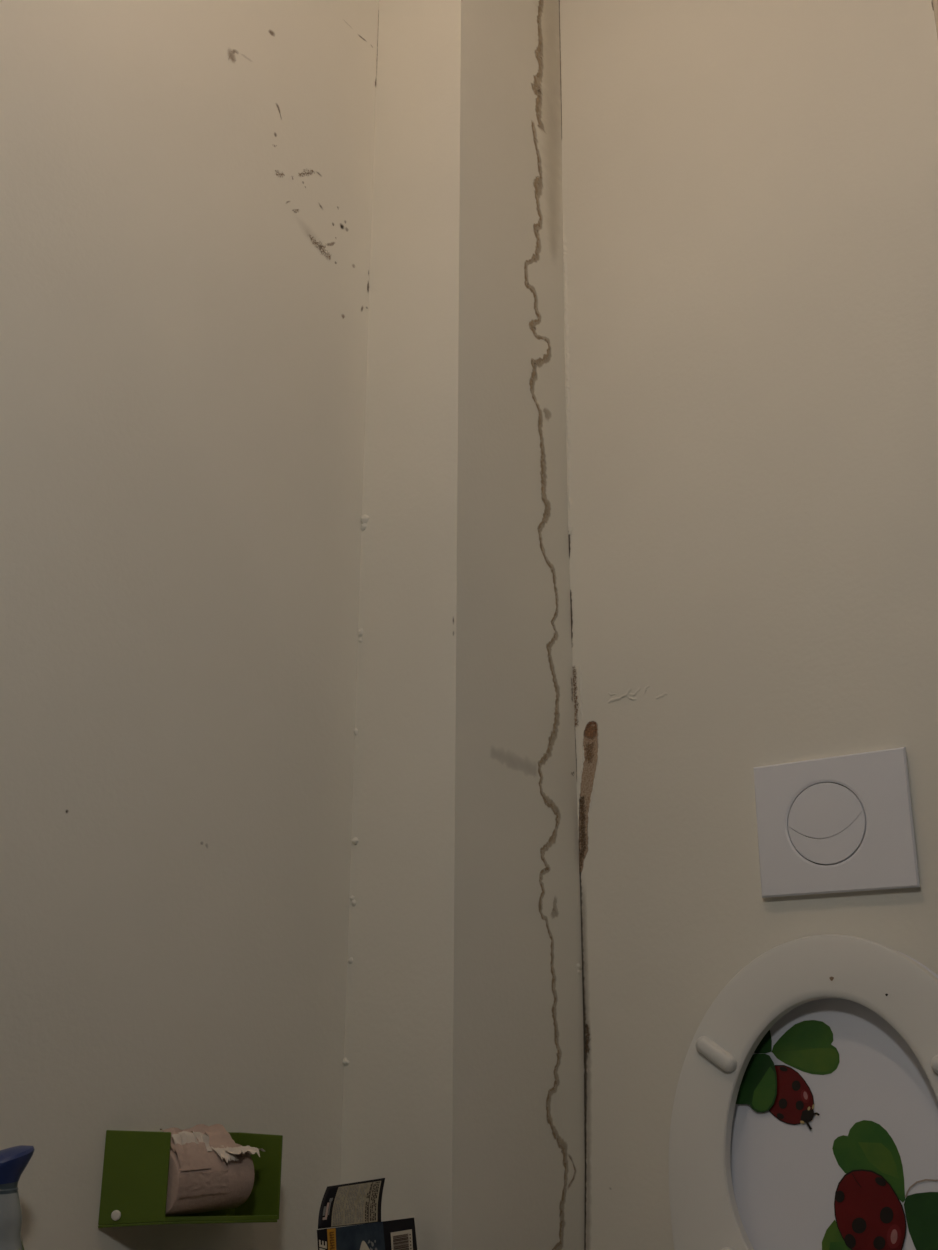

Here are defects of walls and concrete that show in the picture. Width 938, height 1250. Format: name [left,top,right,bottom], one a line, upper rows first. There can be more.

crack [556,1,564,137]
crack [566,519,574,556]
crack [580,875,590,1250]